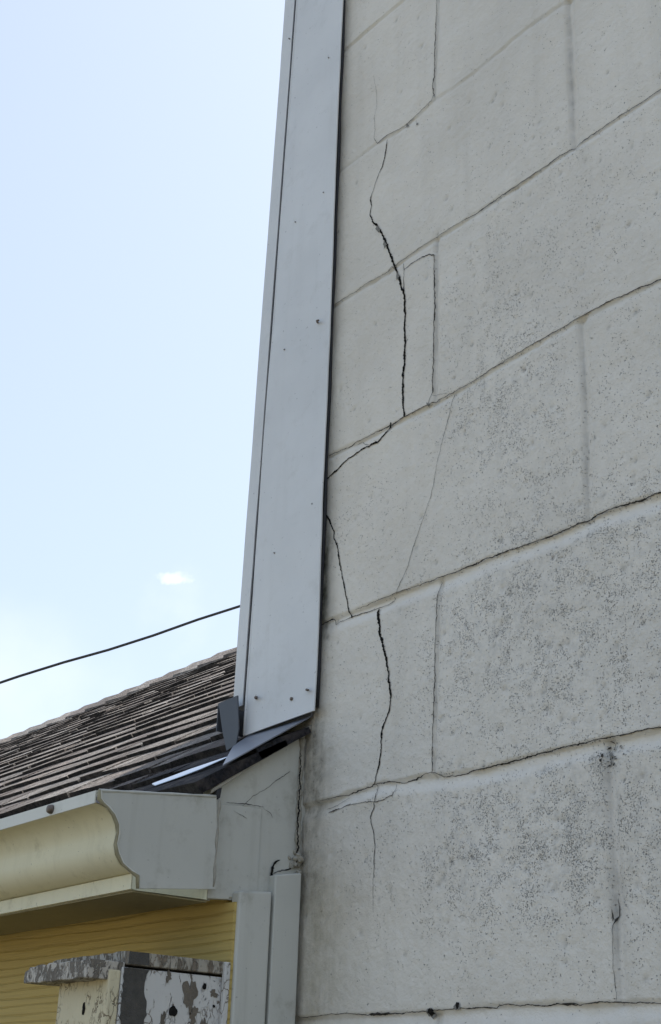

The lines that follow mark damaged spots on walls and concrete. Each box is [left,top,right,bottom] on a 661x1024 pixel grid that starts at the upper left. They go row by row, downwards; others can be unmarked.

crack [226,4,661,877]